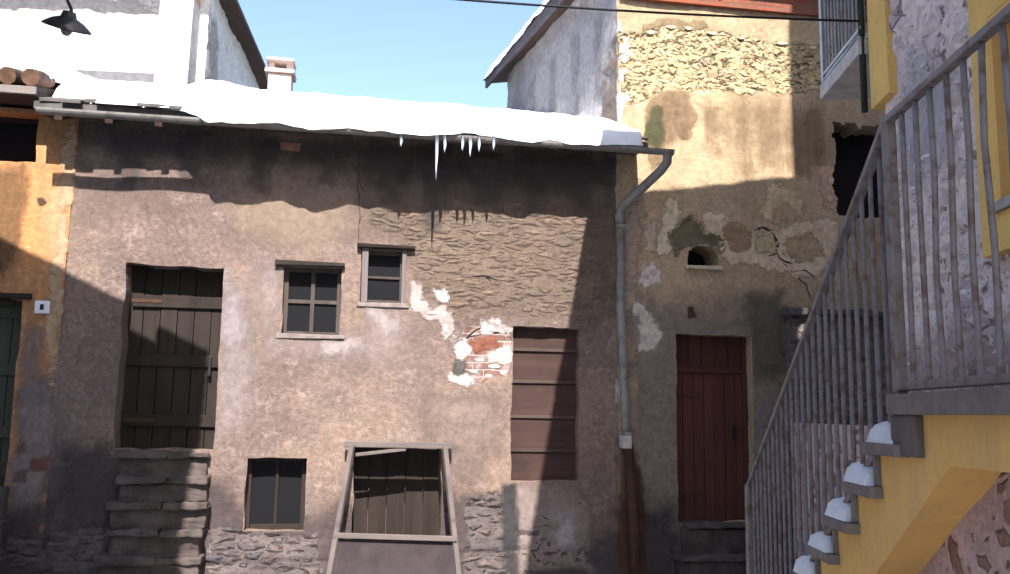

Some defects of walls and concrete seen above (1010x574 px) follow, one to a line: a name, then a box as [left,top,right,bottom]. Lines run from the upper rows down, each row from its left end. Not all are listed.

flaking render [600,18,836,123]
water stain [644,90,698,170]
water stain [0,166,27,274]
spalling [637,164,840,288]
spalling [410,280,513,388]
peeling [632,300,663,352]